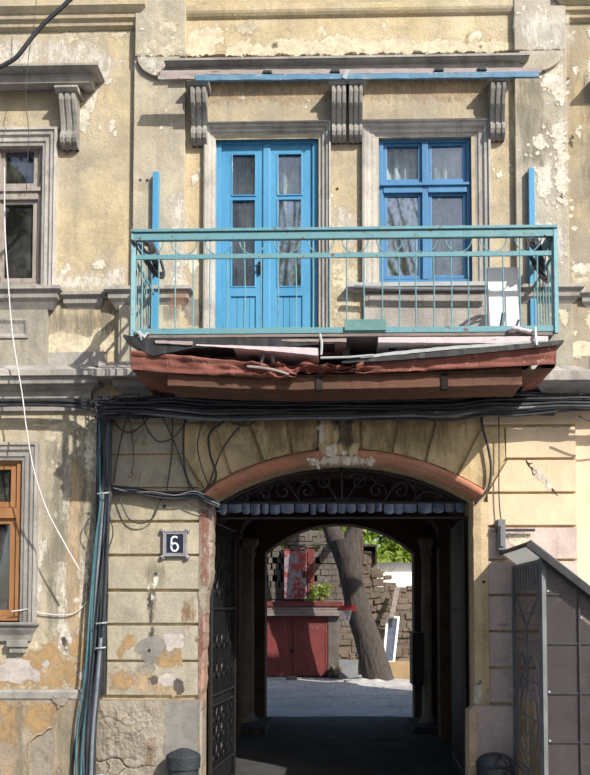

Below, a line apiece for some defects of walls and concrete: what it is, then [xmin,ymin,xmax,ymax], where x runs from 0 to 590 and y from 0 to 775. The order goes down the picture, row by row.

flaking render [515,5,576,51]
flaking render [59,18,513,136]
flaking render [539,57,590,106]
flaking render [524,117,590,289]
flaking render [56,258,126,291]
flaking render [168,242,203,285]
flaking render [550,309,590,359]
flaking render [307,421,375,469]
crack [526,460,558,496]
flaking render [0,417,97,689]
flaking render [109,504,211,697]
crack [96,757,155,774]